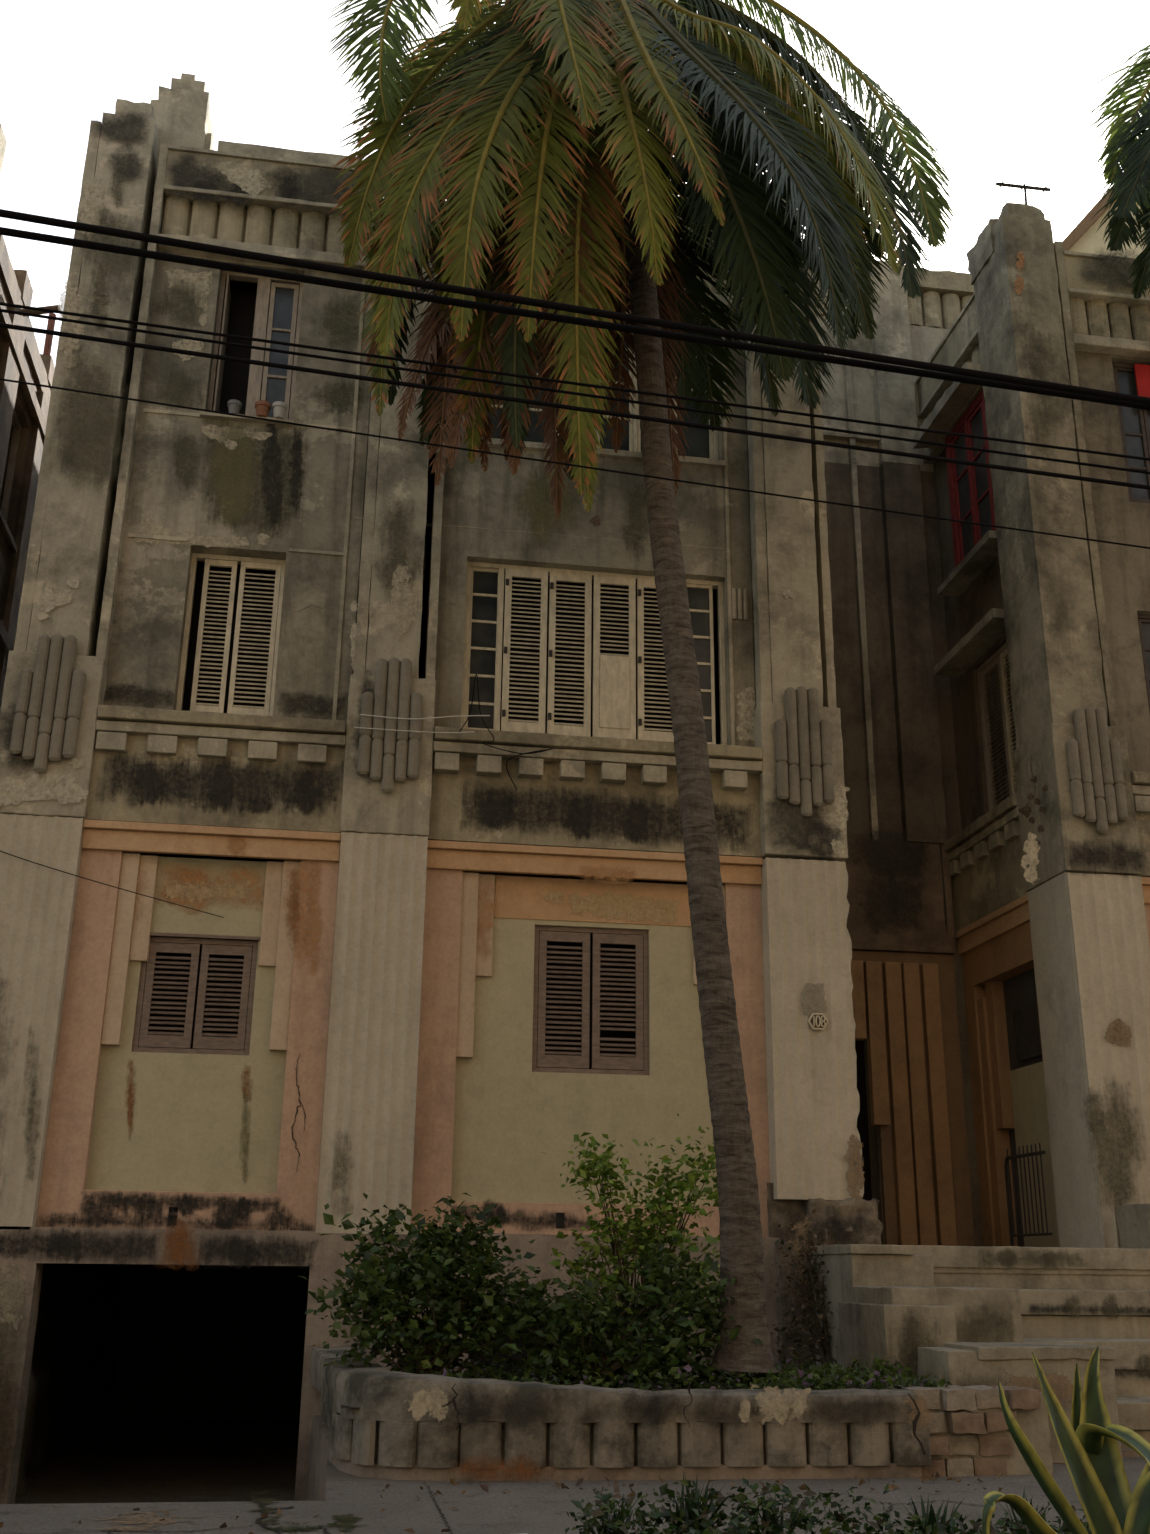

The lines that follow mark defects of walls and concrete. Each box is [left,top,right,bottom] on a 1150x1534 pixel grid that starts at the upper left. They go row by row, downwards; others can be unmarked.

water stain [85,113,147,329]
water stain [174,424,303,535]
peeling [390,560,416,640]
water stain [102,753,343,813]
water stain [461,784,683,843]
water stain [713,804,748,845]
rust [241,1068,251,1178]
crack [291,1054,306,1170]
water stain [0,1192,313,1268]